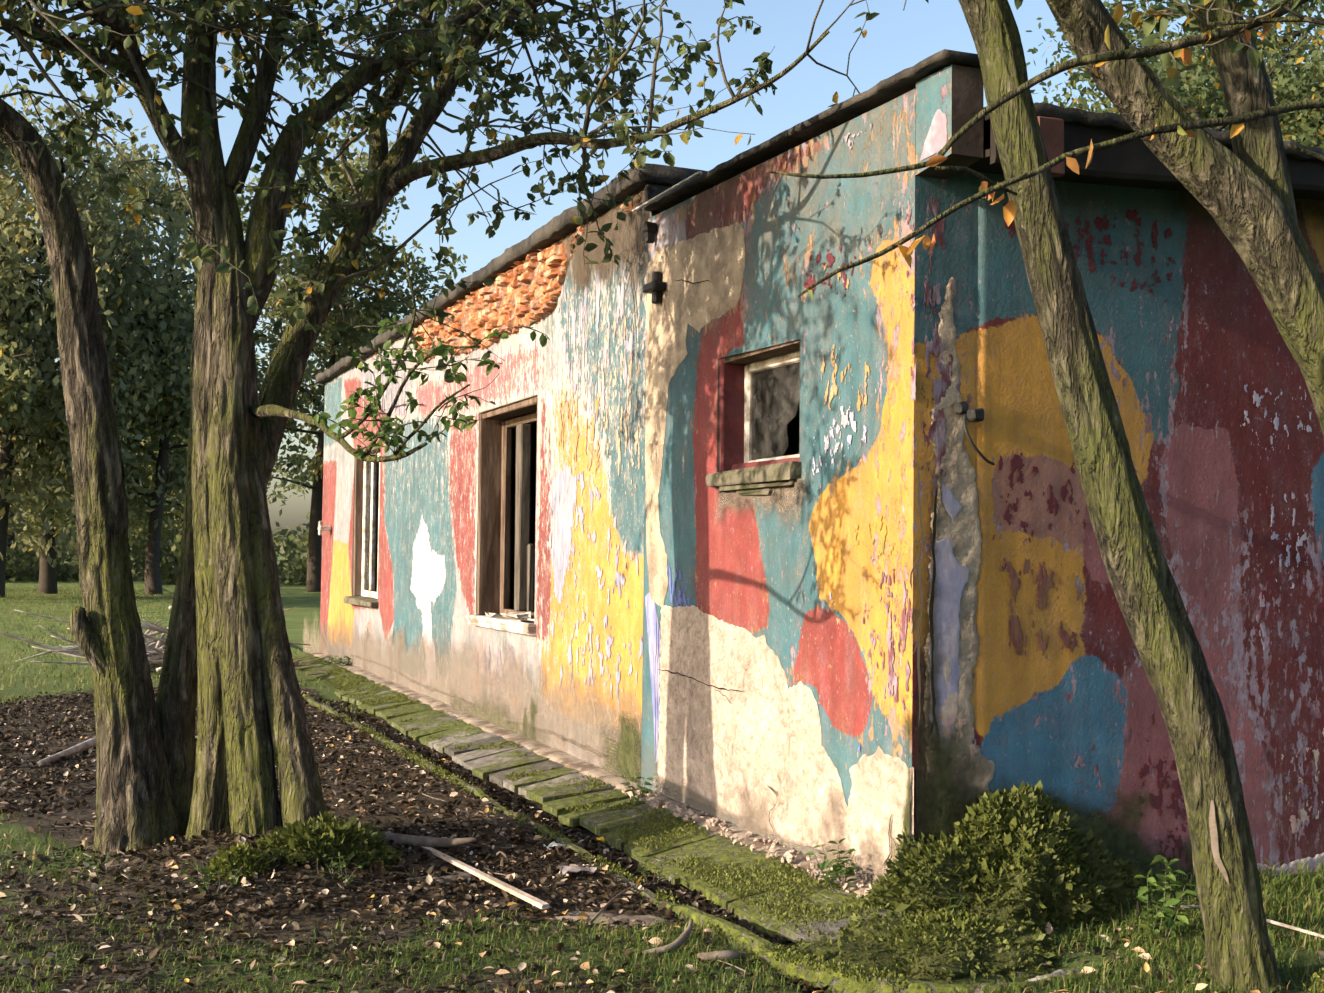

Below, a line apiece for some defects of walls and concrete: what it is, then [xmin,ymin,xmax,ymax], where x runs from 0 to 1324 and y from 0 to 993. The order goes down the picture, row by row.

peeling [1064,203,1186,362]
peeling [1240,385,1312,451]
flaking render [360,196,995,877]
crack [655,618,745,758]
peeling [999,453,1086,657]
peeling [1256,592,1270,651]
peeling [1270,492,1311,595]